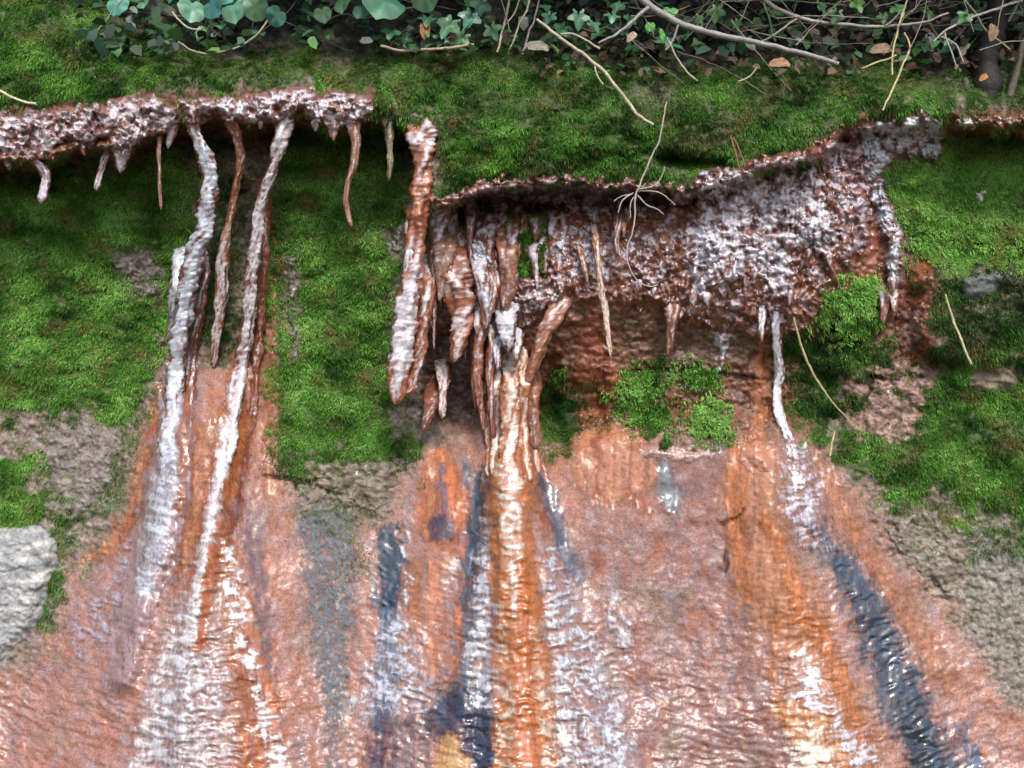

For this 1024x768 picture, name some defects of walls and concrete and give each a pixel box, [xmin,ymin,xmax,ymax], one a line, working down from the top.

water stain [0,85,377,175]
water stain [429,108,1024,376]
rust [73,376,166,565]
water stain [72,351,287,768]
rust [170,219,287,768]
rust [407,448,472,695]
water stain [297,443,640,768]
rust [530,459,554,539]
rust [715,337,888,768]
water stain [780,438,984,768]
rust [805,448,960,697]
rust [435,730,472,768]